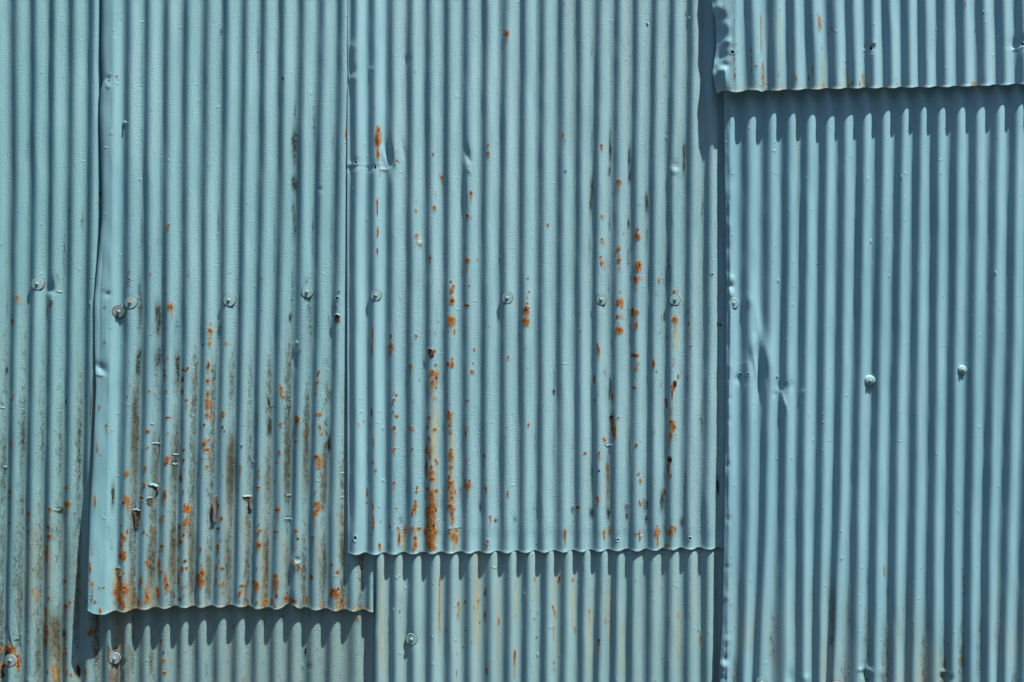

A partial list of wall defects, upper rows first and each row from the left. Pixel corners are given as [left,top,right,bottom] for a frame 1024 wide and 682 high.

rust [447,280,470,335]
rust [521,278,530,326]
rust [615,298,639,335]
rust [428,350,454,389]
rust [203,362,226,433]
rust [652,358,679,439]
rust [584,393,620,472]
rust [389,410,472,552]
rust [89,448,225,609]
rust [238,567,308,606]
rust [329,587,345,604]
rust [0,643,21,678]